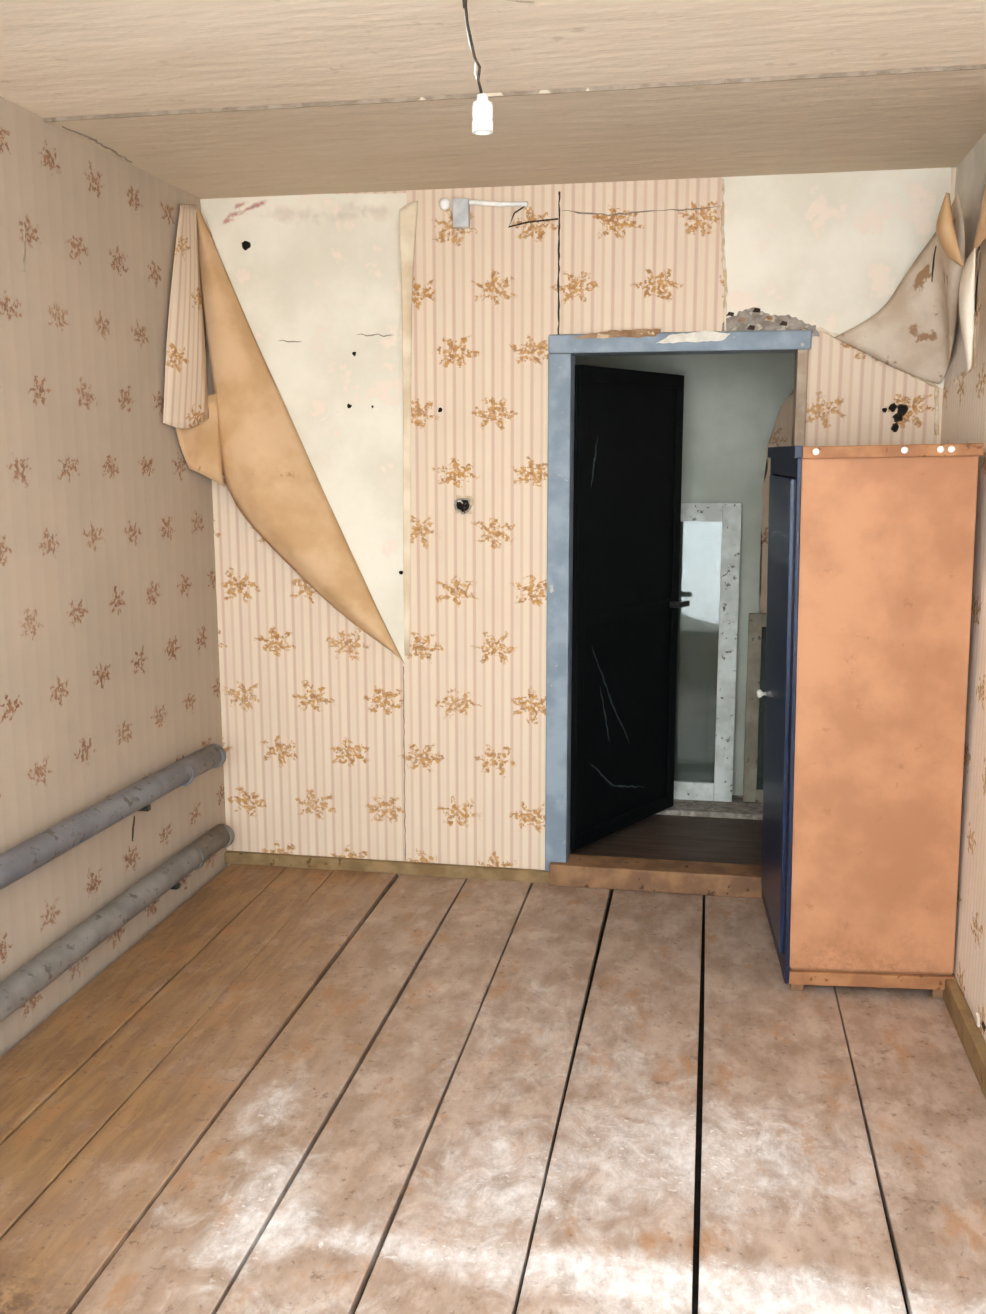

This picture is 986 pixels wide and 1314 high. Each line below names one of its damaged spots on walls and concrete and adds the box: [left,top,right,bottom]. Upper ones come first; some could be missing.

flaking render [200,193,407,662]
flaking render [574,167,952,344]